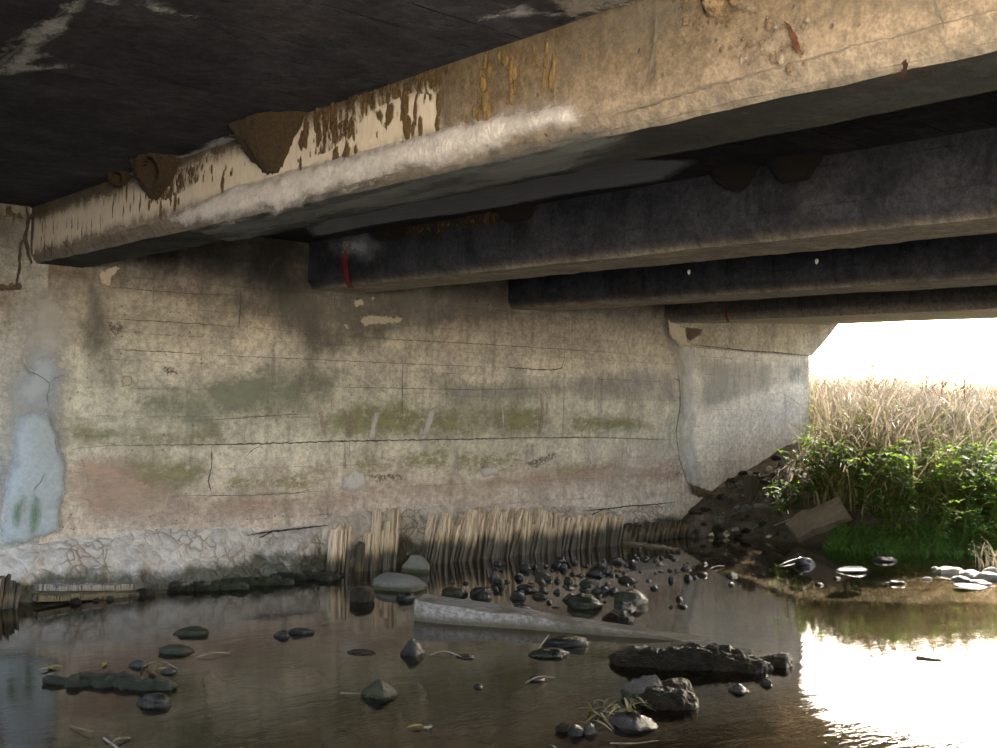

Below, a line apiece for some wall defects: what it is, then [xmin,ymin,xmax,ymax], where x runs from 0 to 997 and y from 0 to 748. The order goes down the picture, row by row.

peeling [507,5,532,17]
peeling [553,0,638,18]
spalling [673,0,755,38]
spalling [720,15,810,73]
peeling [175,135,235,158]
water stain [32,85,439,254]
spalling [353,297,403,327]
water stain [18,356,58,409]
water stain [150,377,301,421]
water stain [369,413,379,438]